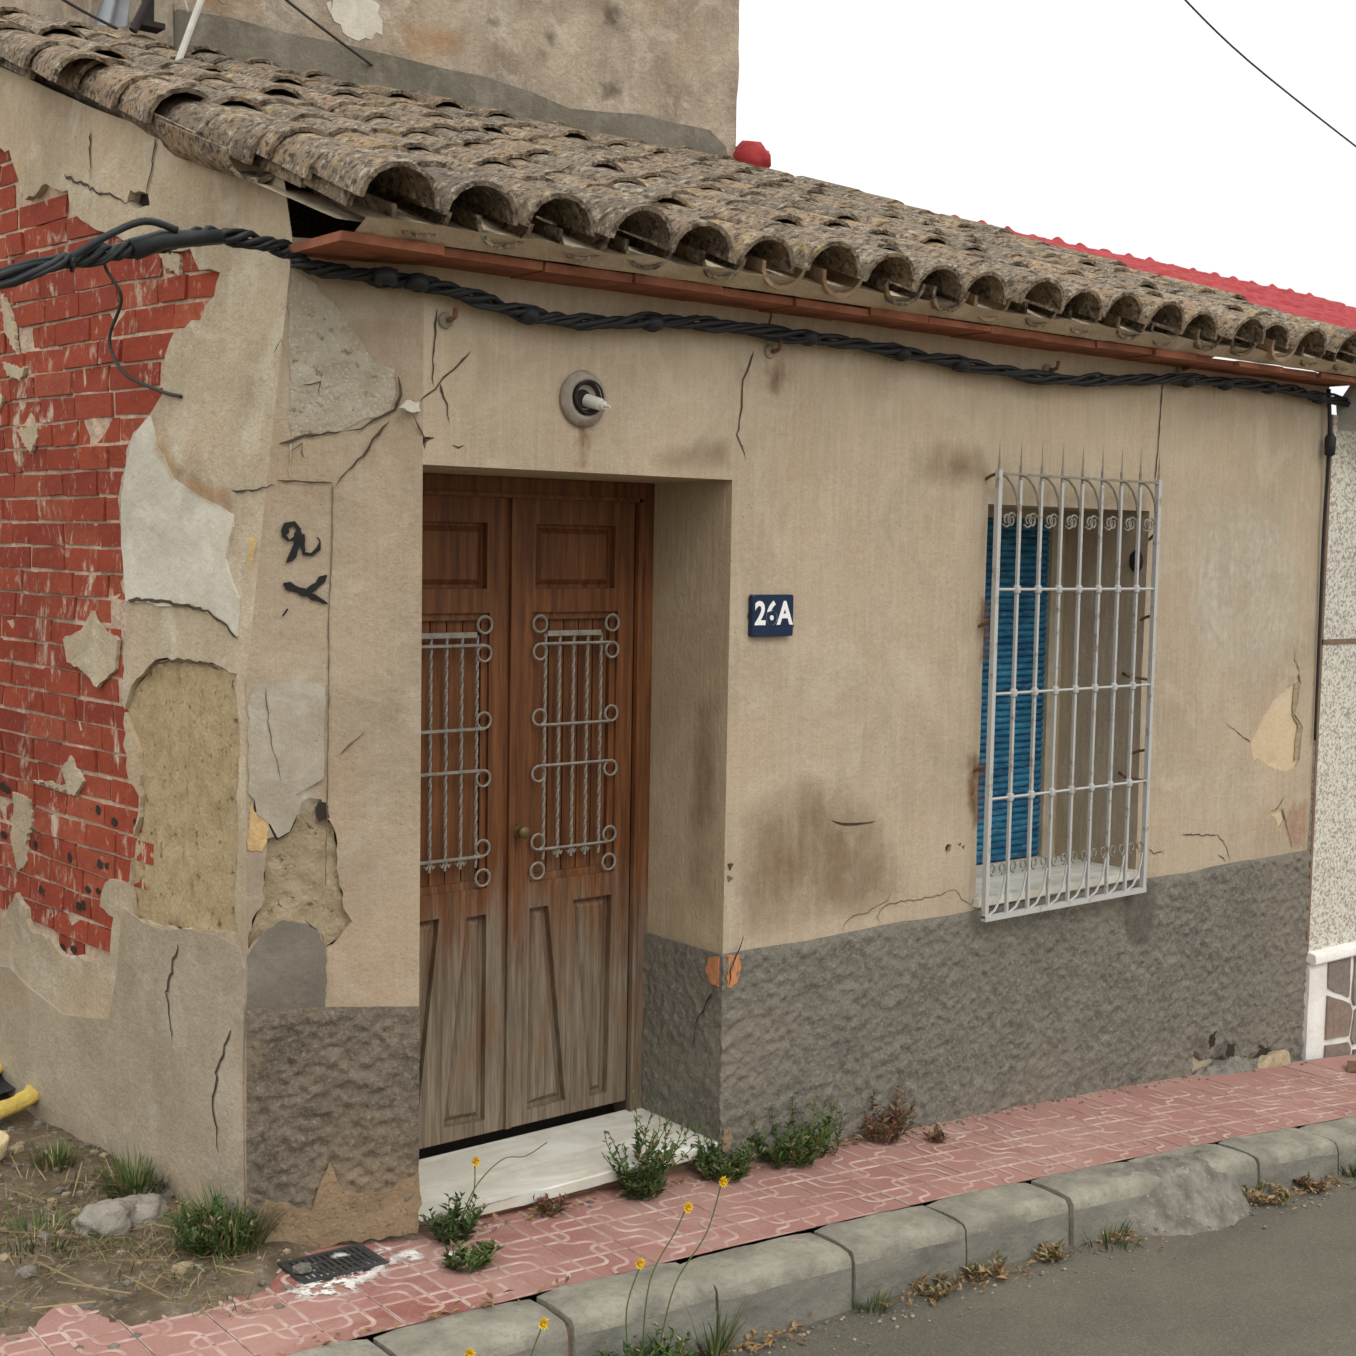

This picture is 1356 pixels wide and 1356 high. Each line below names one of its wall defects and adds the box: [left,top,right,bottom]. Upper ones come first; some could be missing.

peeling [326,0,383,41]
crack [736,313,772,459]
flaking render [0,150,351,961]
crack [232,311,471,886]
spalling [1228,659,1302,771]
crack [1149,834,1231,861]
crack [845,890,976,924]
crack [165,944,179,1039]
spalling [693,938,743,1044]
crack [212,1030,231,1150]
spalling [1192,1030,1291,1076]